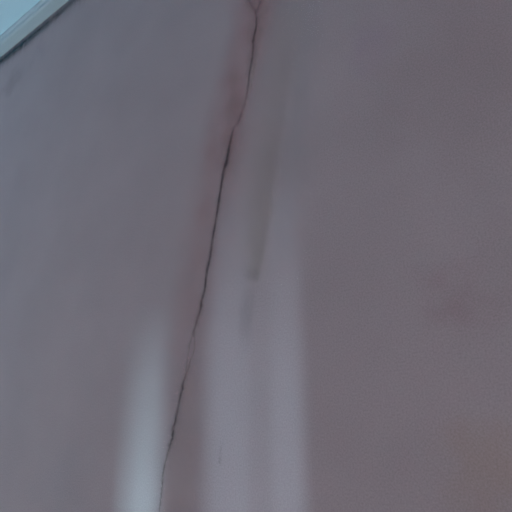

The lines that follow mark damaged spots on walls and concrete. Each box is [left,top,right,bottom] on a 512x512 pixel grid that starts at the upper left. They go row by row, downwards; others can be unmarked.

crack [196,140,231,322]